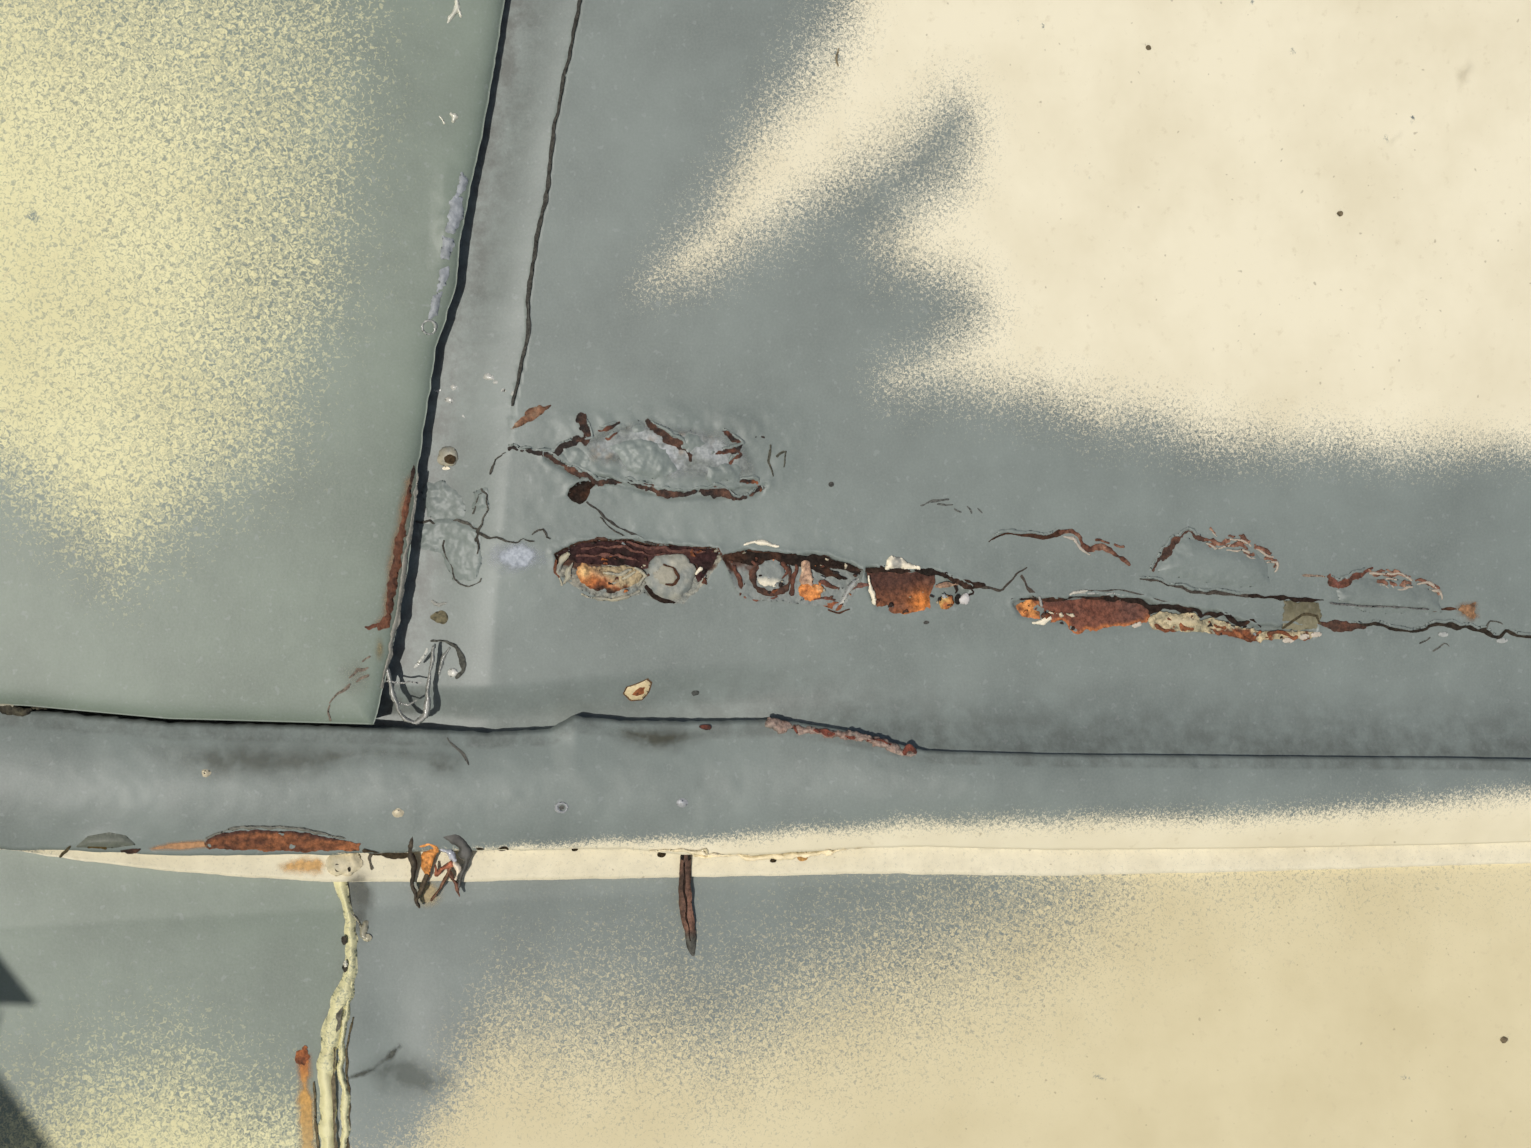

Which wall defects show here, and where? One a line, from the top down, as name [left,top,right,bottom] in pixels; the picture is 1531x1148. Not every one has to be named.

crack [511,0,582,406]
rust [365,465,419,688]
peeling [553,550,573,586]
peeling [690,549,718,585]
peeling [874,592,970,614]
peeling [1023,606,1086,630]
crack [987,527,1531,652]
rust [765,717,917,757]
rust [153,825,361,871]
peeling [407,834,473,908]
rust [678,855,697,956]
rust [295,1046,313,1148]